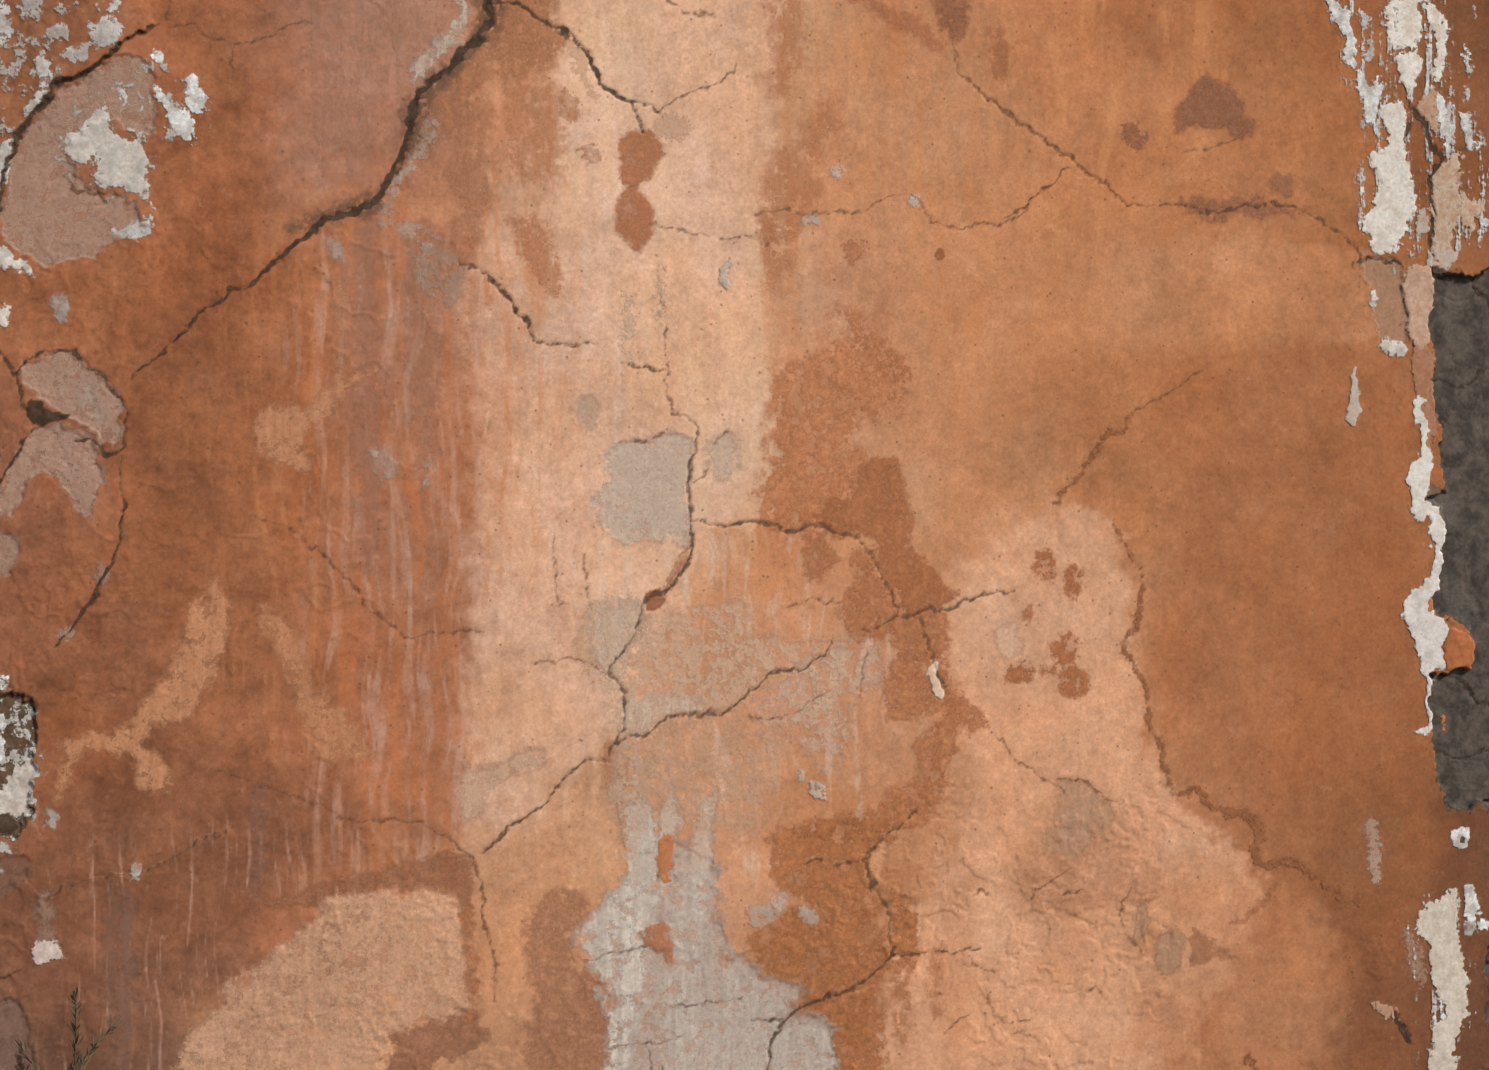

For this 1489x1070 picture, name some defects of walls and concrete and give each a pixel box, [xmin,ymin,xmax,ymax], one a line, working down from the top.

peeling [0,0,210,277]
water stain [616,130,665,253]
crack [668,52,1362,274]
peeling [0,349,124,577]
crack [0,0,736,647]
spalling [1326,0,1489,849]
spalling [0,675,59,872]
crack [238,328,1015,1000]
crack [1113,523,1362,907]
peeling [31,892,67,965]
crack [614,810,995,1070]
peeling [1401,884,1489,1070]